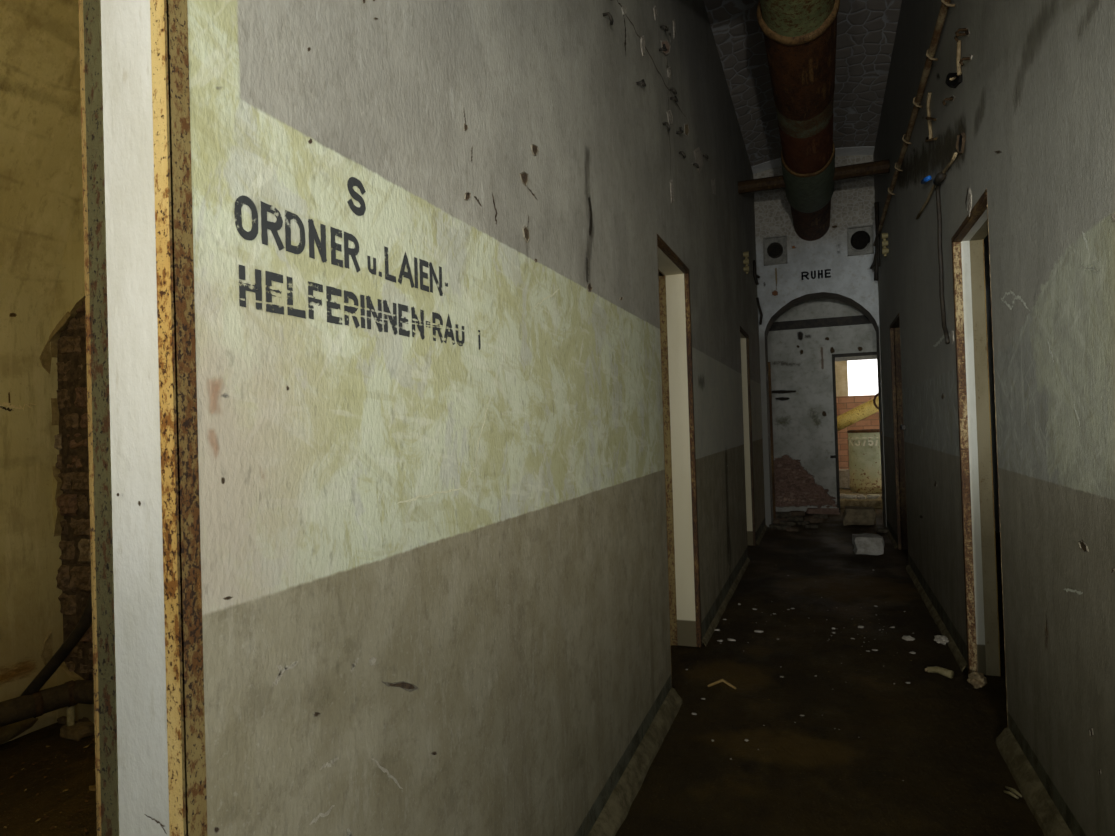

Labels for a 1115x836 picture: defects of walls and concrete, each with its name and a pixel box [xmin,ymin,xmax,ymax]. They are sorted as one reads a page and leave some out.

corrosion [763,17,837,174]
spalling [40,301,93,680]